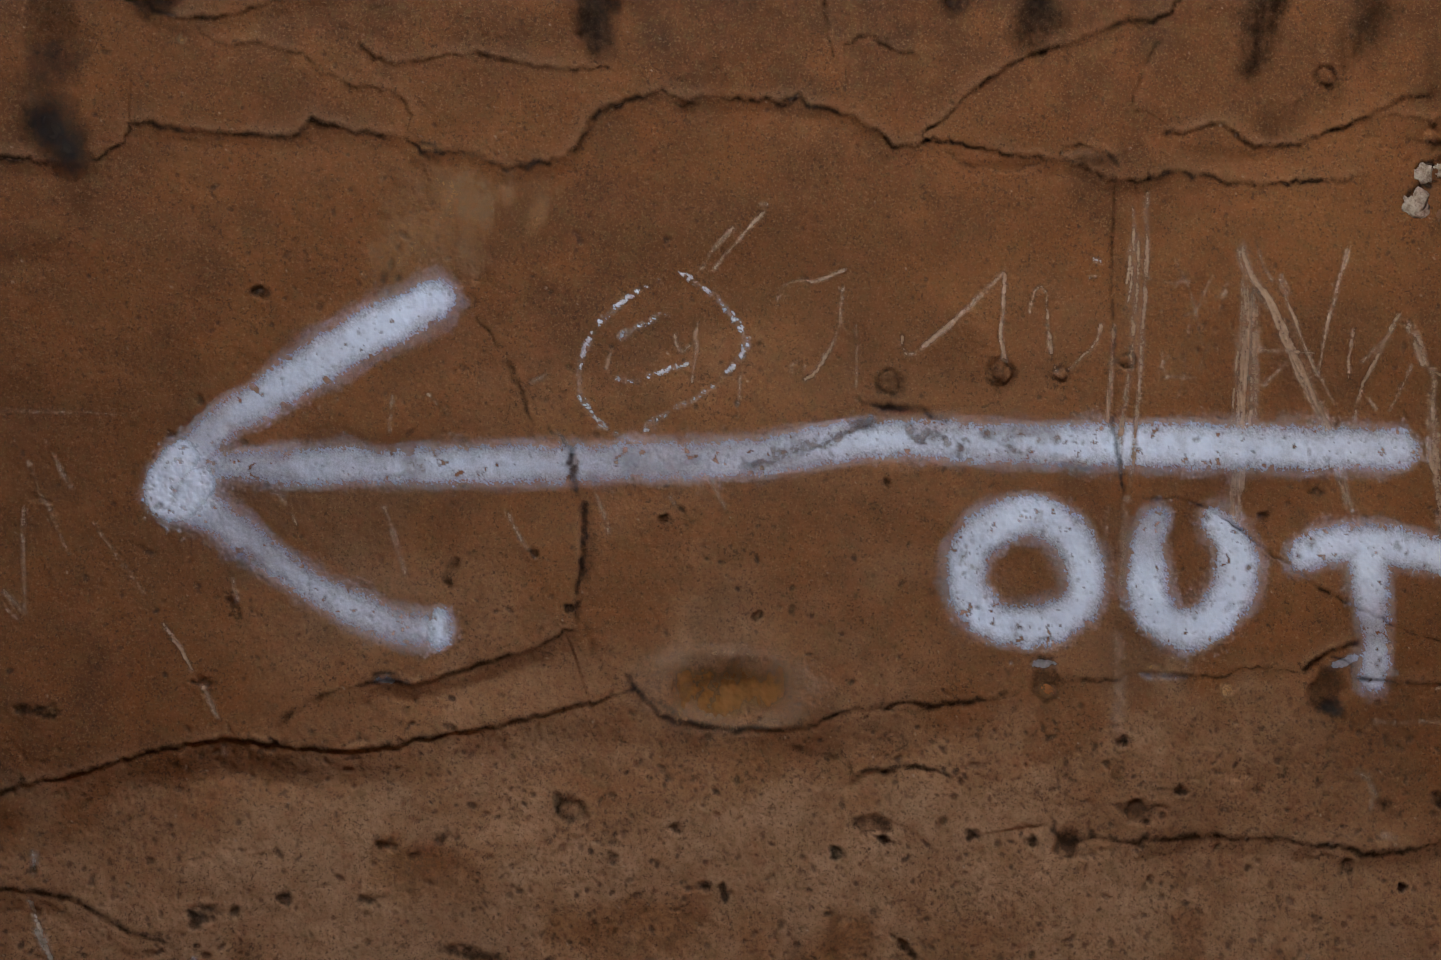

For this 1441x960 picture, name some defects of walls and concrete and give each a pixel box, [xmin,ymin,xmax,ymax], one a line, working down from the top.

damp [579,0,616,58]
damp [24,106,87,165]
crack [225,91,675,172]
crack [731,93,1367,255]
spalling [1401,161,1441,222]
crack [750,403,962,467]
crack [480,324,588,644]
crack [1201,642,1393,682]
crack [629,678,846,747]
crack [884,692,1007,710]
crack [1293,841,1427,857]
crack [5,887,166,943]